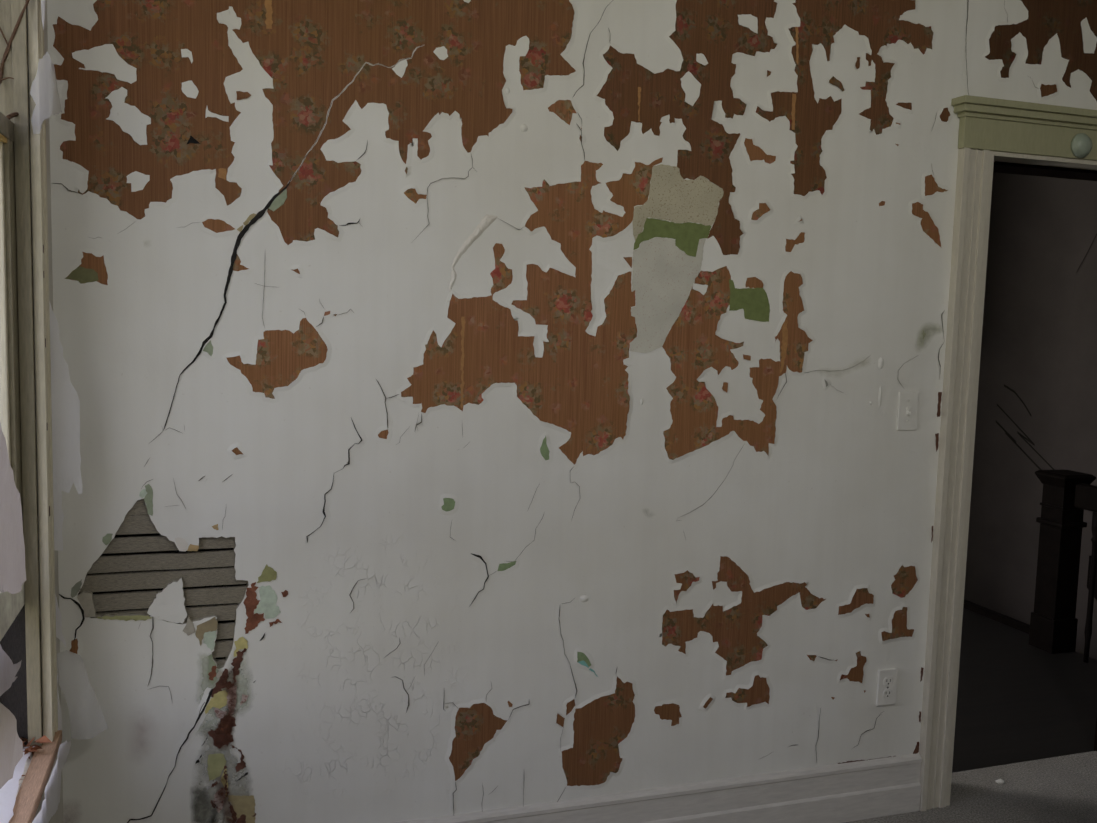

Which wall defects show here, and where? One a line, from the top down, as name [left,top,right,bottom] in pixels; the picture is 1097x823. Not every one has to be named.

peeling [981,0,1097,110]
crack [141,45,424,507]
peeling [47,0,937,469]
crack [302,377,427,544]
flaking render [71,484,248,678]
crack [121,616,213,823]
damp [194,565,288,823]
crack [380,636,458,714]
peeling [445,697,516,784]
crack [450,485,544,609]
peeling [556,672,685,790]
peeling [658,552,921,712]